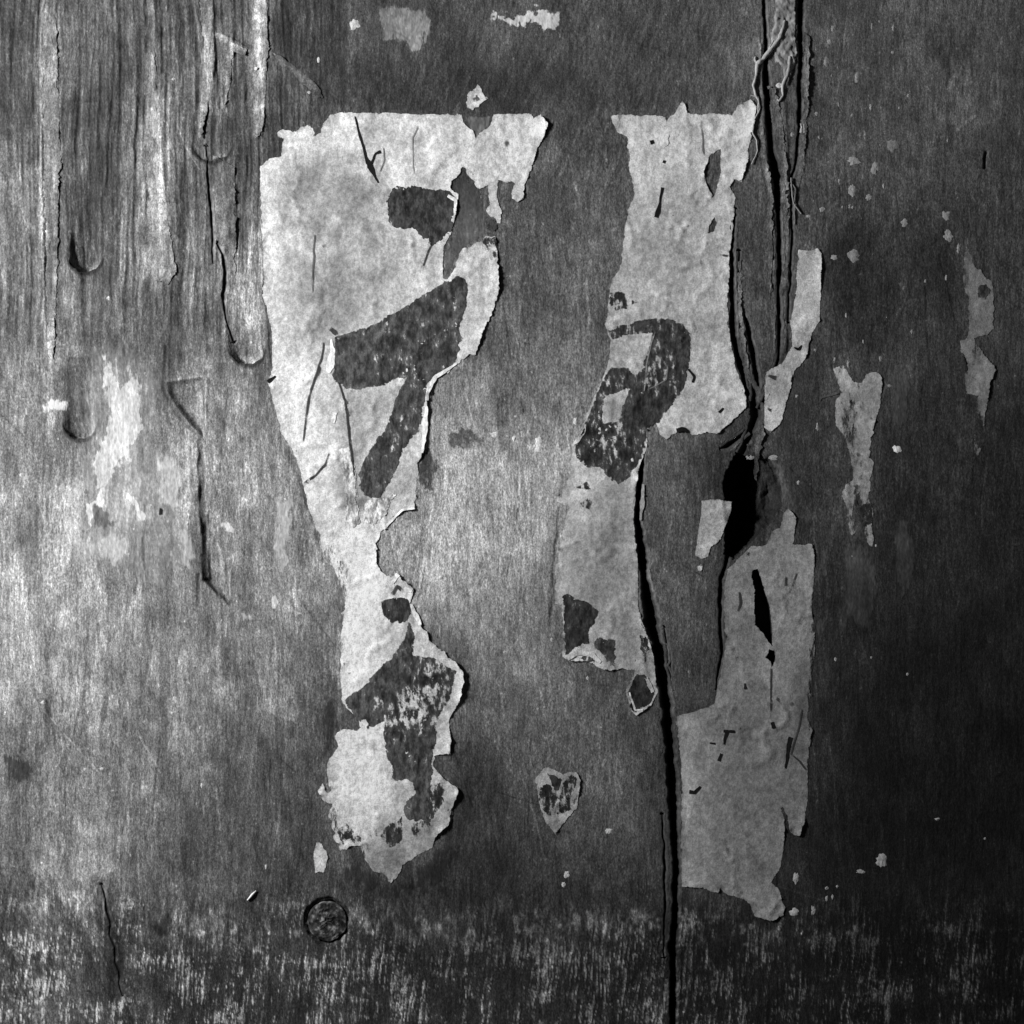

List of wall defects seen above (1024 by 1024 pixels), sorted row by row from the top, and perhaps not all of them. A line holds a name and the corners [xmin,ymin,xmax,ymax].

crack [719,0,808,457]
crack [633,426,682,1024]